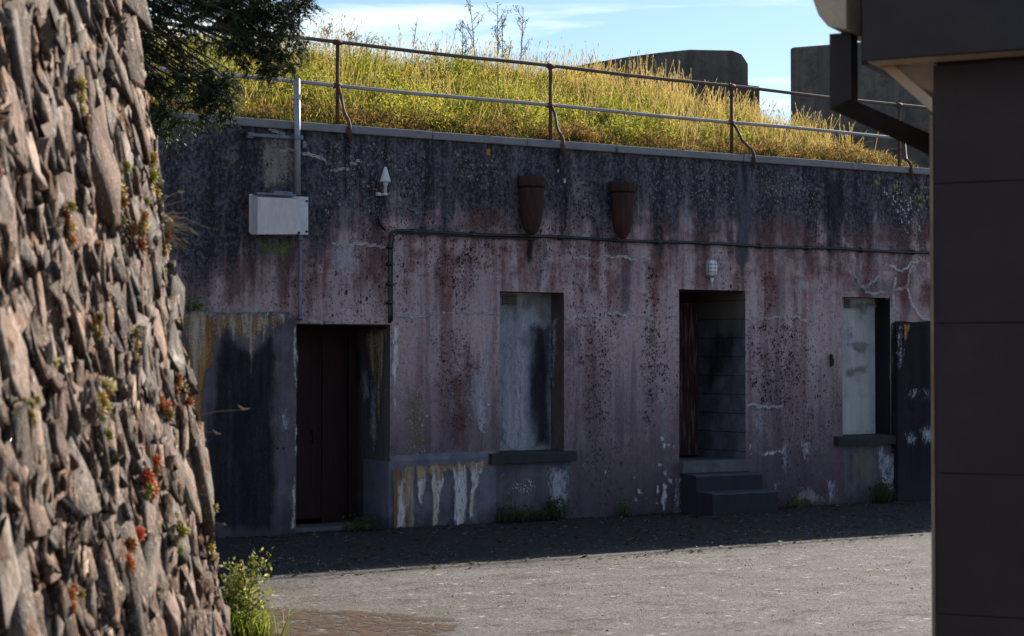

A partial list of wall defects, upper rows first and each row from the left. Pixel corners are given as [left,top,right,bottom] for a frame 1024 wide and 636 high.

crack [849,260,930,321]
rust [185,308,293,421]
leakage [208,337,297,528]
rust [393,459,487,528]
leakage [500,303,557,451]
peeling [656,464,672,511]